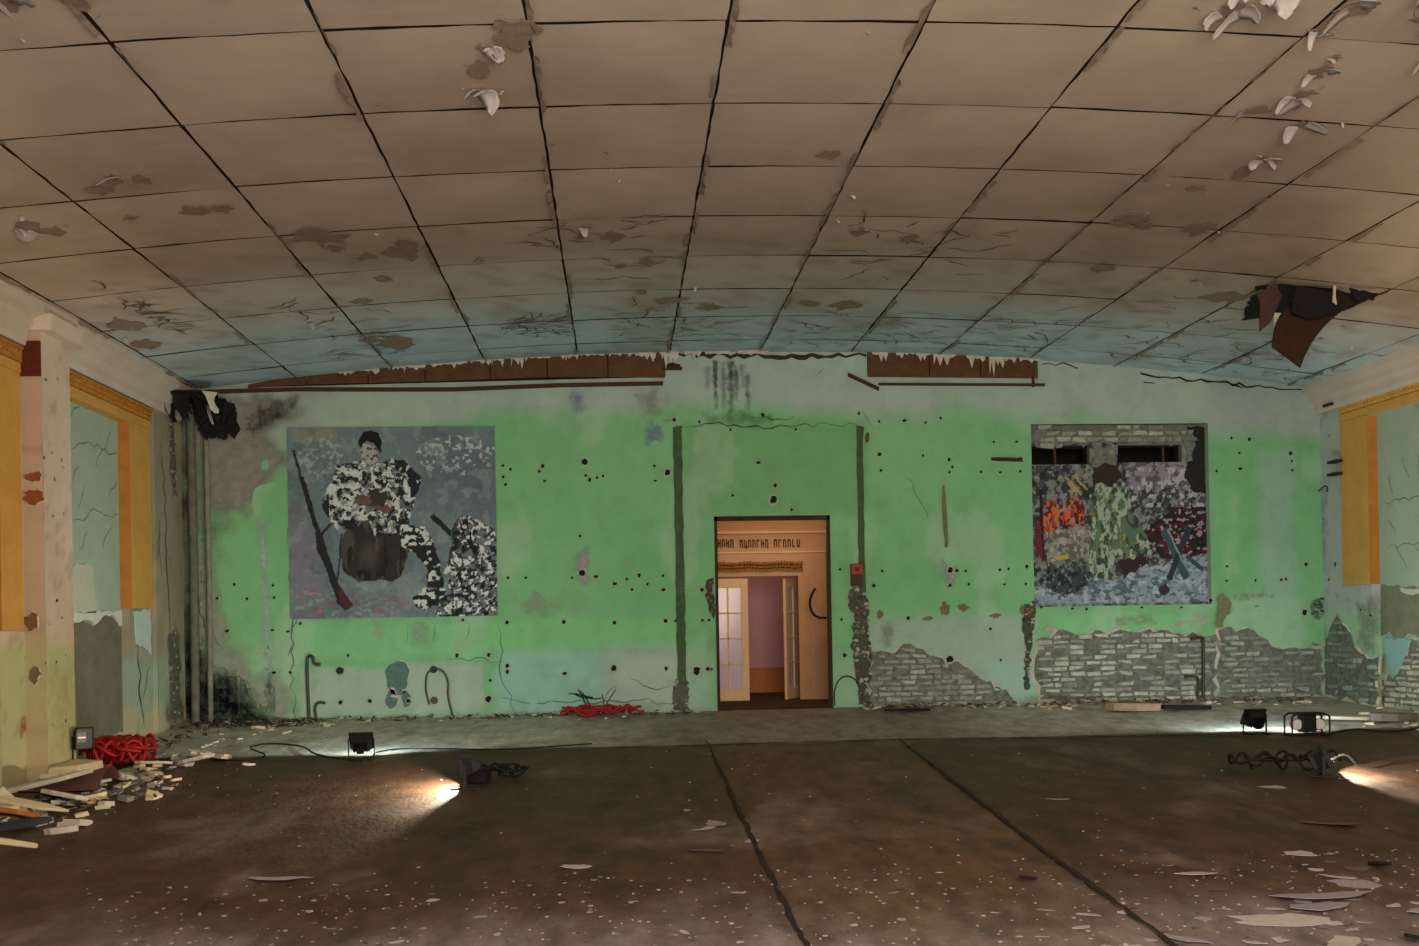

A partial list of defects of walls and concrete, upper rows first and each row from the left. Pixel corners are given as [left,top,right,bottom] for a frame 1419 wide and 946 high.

peeling [0,0,37,43]
peeling [461,18,544,116]
peeling [1193,0,1301,42]
peeling [1227,0,1382,180]
crack [499,211,1348,390]
flaking render [24,563,123,738]
damp [171,397,297,729]
crack [406,625,670,713]
flaking render [840,561,1419,712]
crack [1068,730,1335,738]
crack [514,737,1179,946]